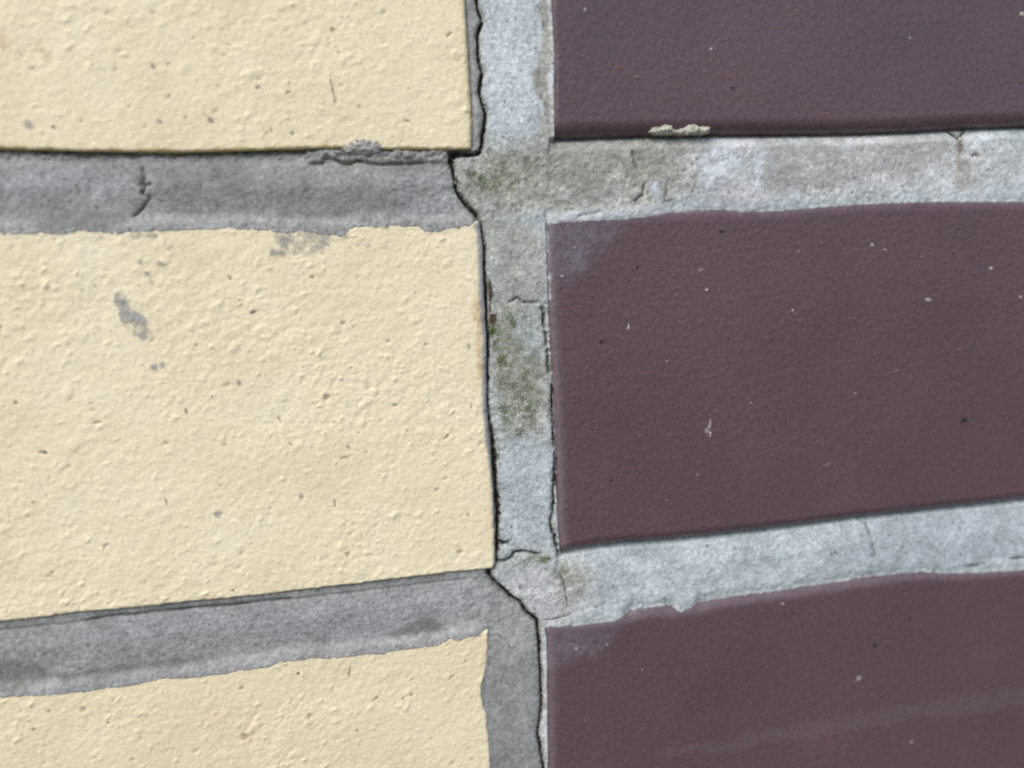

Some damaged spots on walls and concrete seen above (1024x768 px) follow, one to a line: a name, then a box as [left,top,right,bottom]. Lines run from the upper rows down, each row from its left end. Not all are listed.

crack [448,0,571,768]